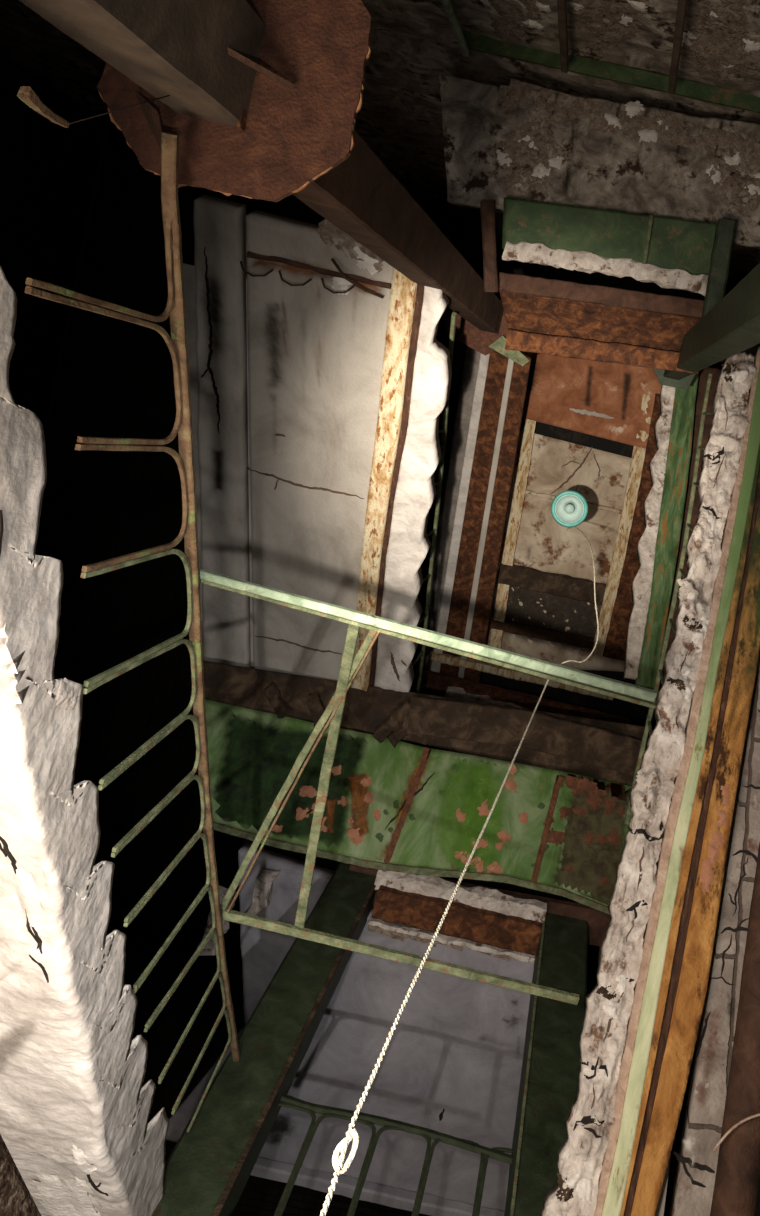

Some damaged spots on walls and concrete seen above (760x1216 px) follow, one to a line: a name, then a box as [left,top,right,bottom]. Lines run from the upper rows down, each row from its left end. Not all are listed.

rust [527,364,535,392]
crack [246,467,364,499]
rust [350,774,368,836]
peeling [518,774,627,852]
crack [0,836,17,874]
peeling [454,830,512,874]
rust [554,781,630,905]
crack [708,850,757,985]
crack [25,909,49,983]
spalling [596,974,632,1019]
spalling [556,1171,595,1204]
crack [671,1151,715,1188]